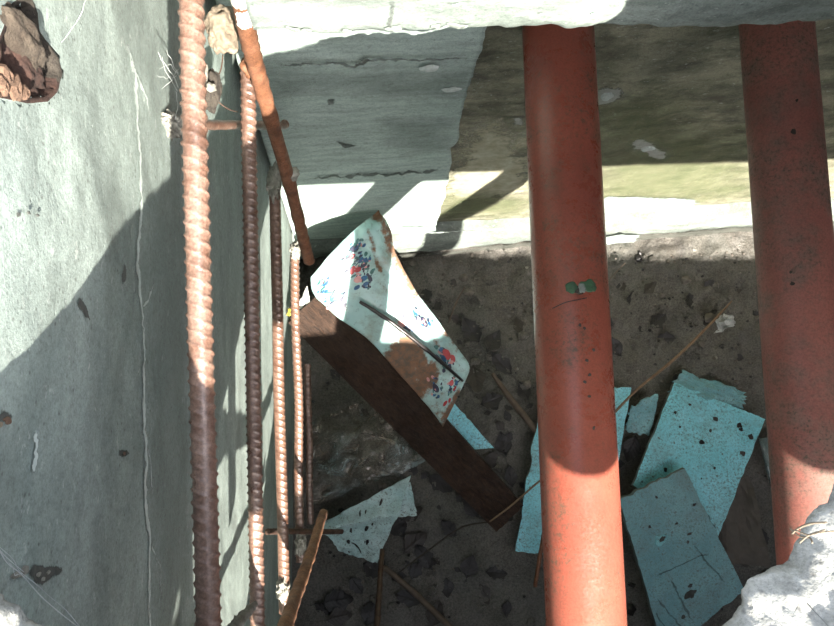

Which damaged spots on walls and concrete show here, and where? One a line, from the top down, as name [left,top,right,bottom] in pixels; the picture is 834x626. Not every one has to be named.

spalling [0,0,63,108]
crack [281,57,459,68]
leakage [445,119,528,201]
crack [319,169,435,179]
leakage [636,227,753,240]
leakage [397,243,531,257]
crack [124,44,162,626]
spalling [0,411,12,428]
spalling [10,565,62,584]